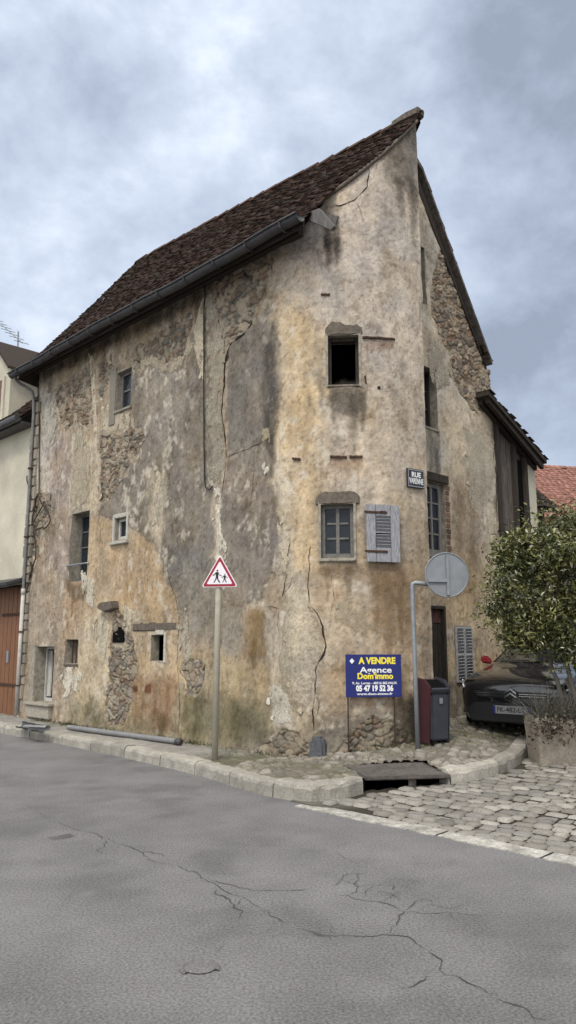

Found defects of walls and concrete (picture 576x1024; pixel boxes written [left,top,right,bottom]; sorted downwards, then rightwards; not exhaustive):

leakage [324,226,339,250]
spalling [41,353,145,506]
crack [213,303,262,500]
spalling [428,252,496,516]
spalling [81,570,141,727]
spalling [176,608,205,699]
crack [259,544,335,729]